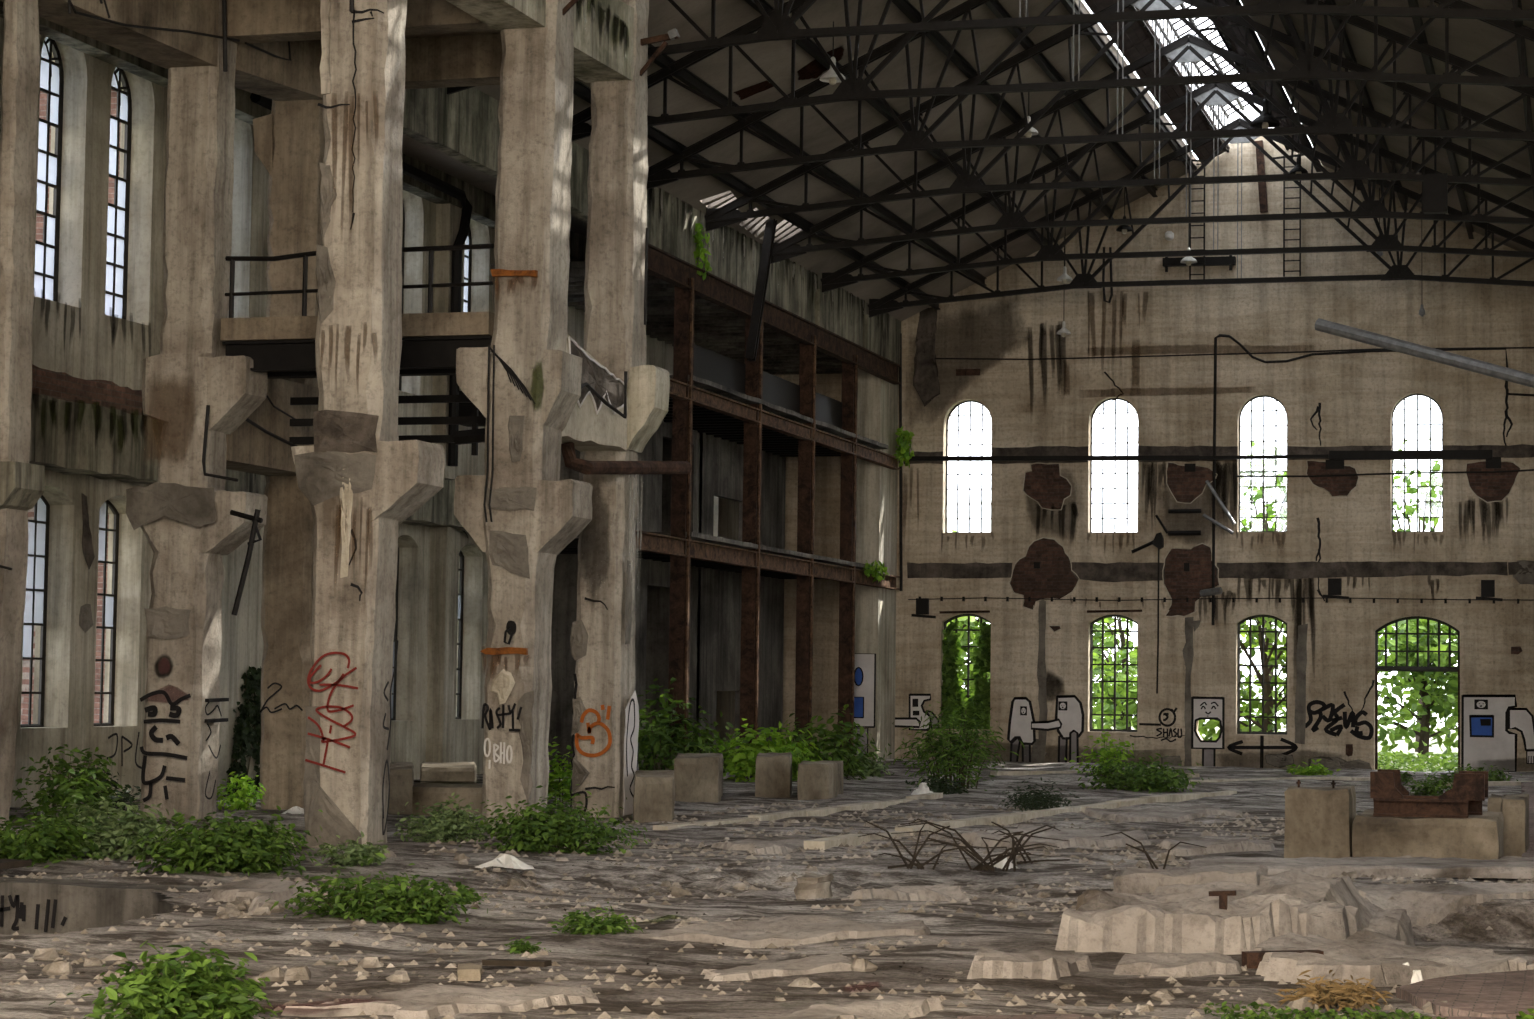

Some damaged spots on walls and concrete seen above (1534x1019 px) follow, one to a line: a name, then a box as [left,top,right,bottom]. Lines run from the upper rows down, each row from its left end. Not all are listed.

damp [913,304,1069,411]
damp [1088,292,1285,396]